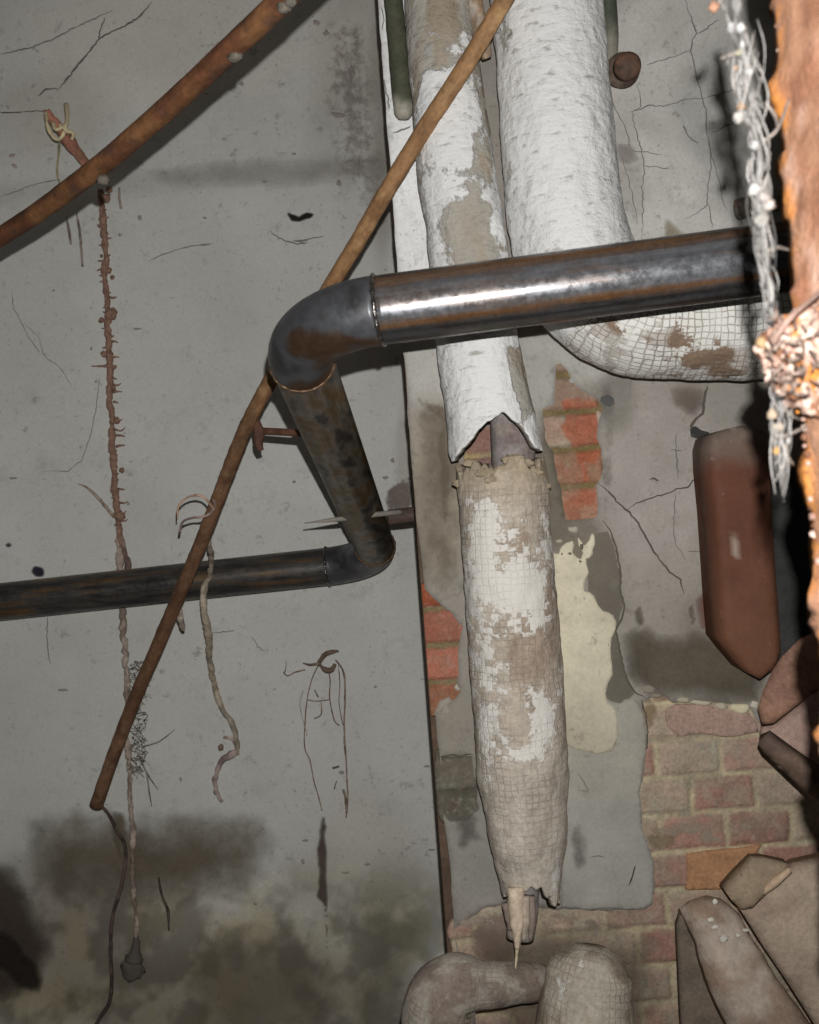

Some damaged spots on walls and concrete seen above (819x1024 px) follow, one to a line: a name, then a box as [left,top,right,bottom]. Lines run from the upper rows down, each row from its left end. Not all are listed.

crack [0,2,152,113]
crack [613,2,736,238]
crack [11,289,100,472]
crack [598,386,708,750]
flaking render [421,583,463,716]
flaking render [520,364,819,1024]
flaking render [435,749,479,823]
water stain [46,815,252,889]
water stain [318,819,327,906]
water stain [0,871,46,969]
flaking render [447,905,505,961]
flaking render [475,1006,515,1024]